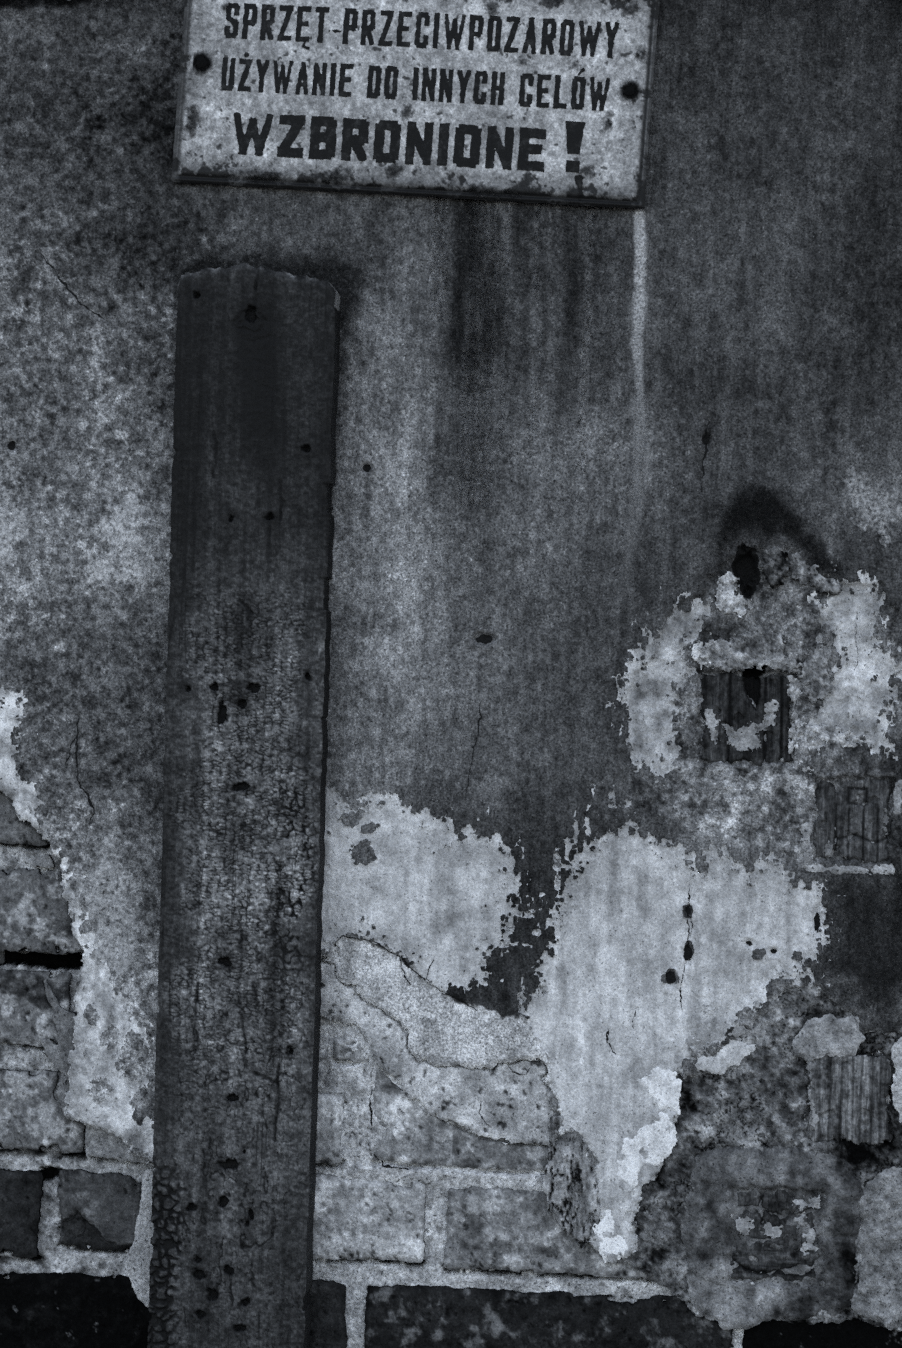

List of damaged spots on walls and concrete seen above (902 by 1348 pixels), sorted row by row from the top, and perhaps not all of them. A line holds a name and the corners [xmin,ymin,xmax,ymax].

leakage [449,200,477,360]
leakage [632,211,646,400]
spalling [475,634,492,644]
peeling [605,543,902,786]
peeling [0,678,156,1166]
peeling [321,779,902,1332]